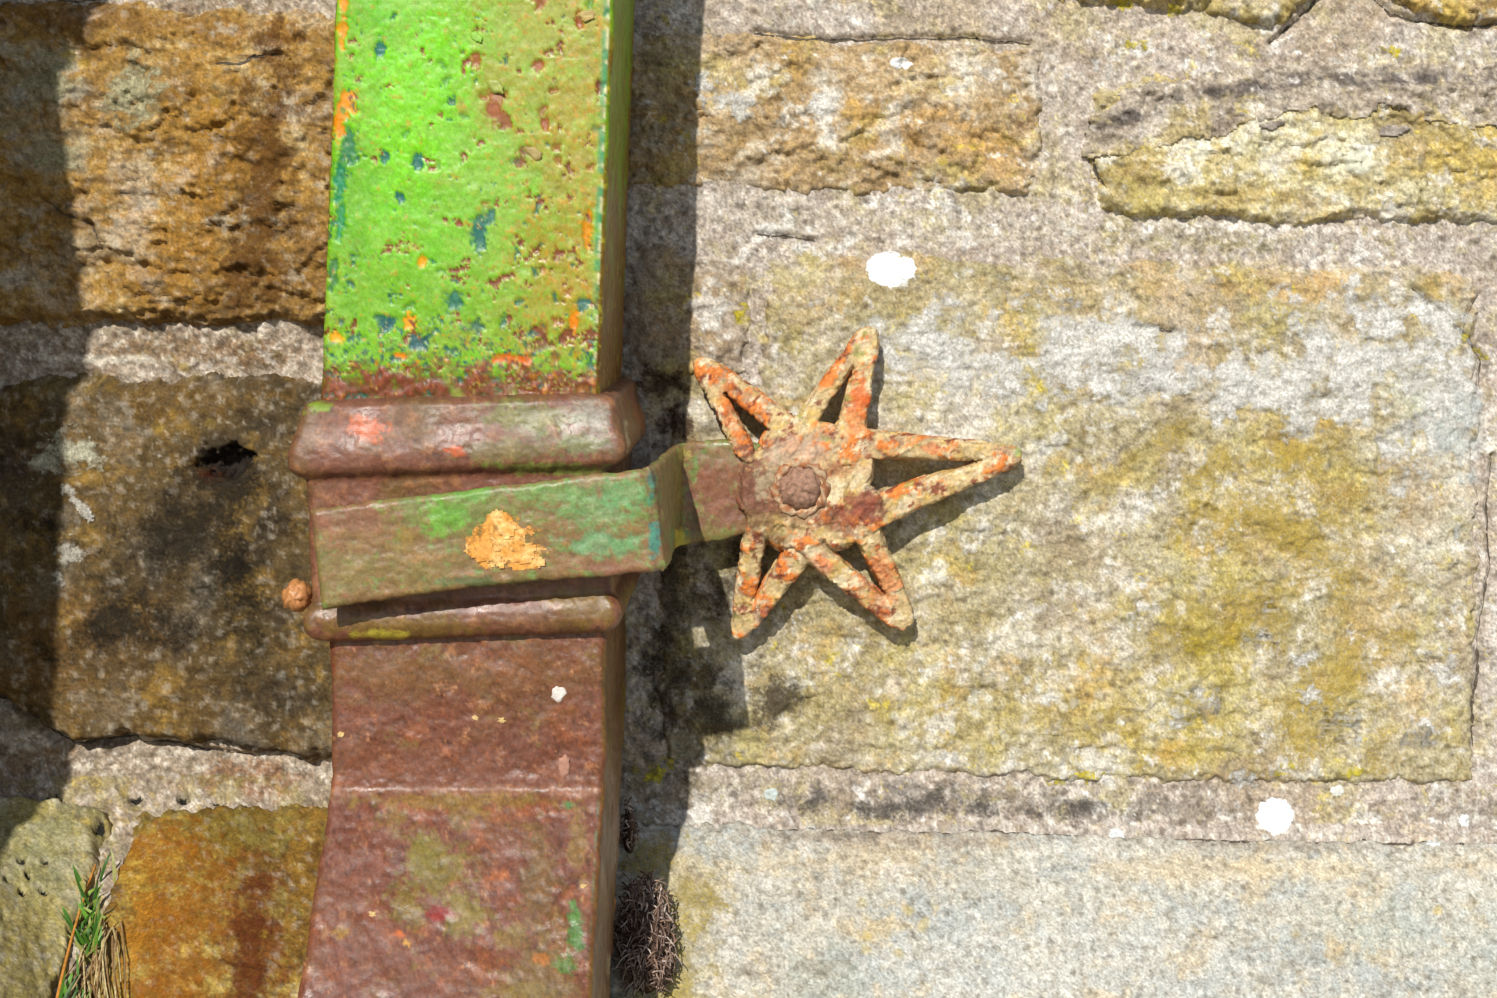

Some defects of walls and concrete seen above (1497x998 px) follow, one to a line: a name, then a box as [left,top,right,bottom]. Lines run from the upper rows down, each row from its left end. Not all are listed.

crack [1269,0,1320,44]
crack [1374,0,1497,28]
water stain [138,445,278,652]
water stain [69,583,200,653]
crack [1470,455,1491,746]